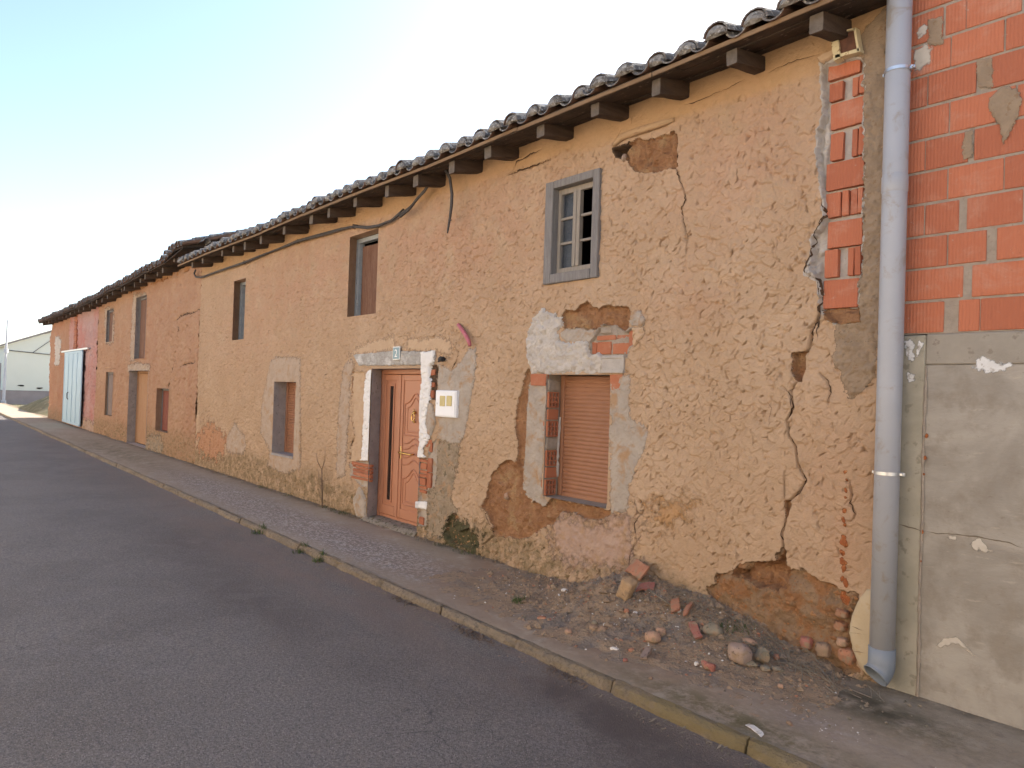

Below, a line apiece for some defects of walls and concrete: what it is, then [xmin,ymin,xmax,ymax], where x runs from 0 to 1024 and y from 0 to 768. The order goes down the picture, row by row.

crack [509,150,546,175]
flaking render [612,117,678,173]
flaking render [803,50,867,326]
flaking render [562,301,645,359]
crack [803,202,828,341]
flaking render [415,350,438,526]
flaking render [482,369,611,540]
crack [766,388,807,540]
flaking render [706,547,860,675]